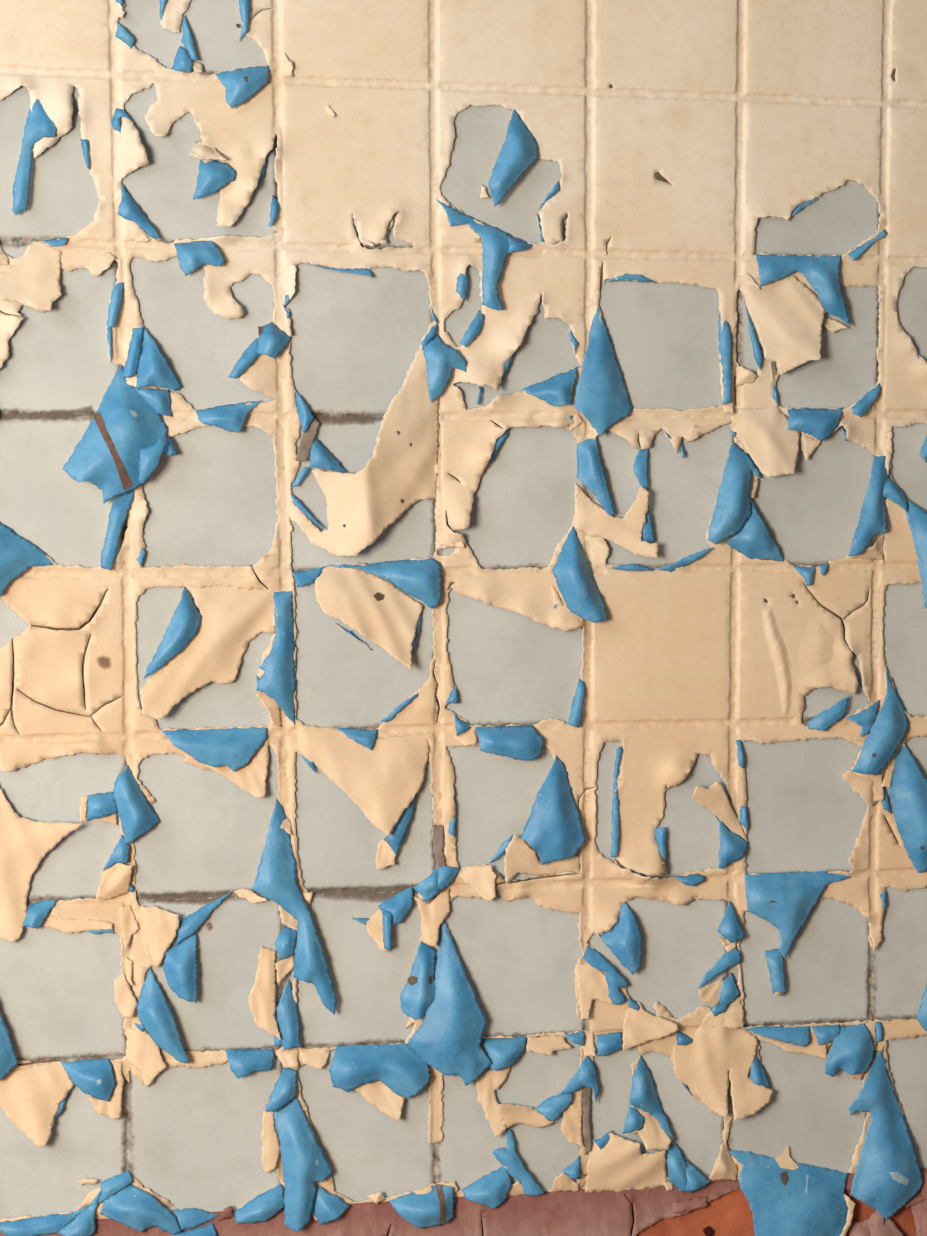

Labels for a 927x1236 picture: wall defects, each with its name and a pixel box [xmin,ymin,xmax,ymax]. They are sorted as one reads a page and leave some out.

peeling [115,0,293,109]
peeling [436,105,562,347]
crack [0,588,122,735]
peeling [0,83,467,1236]
peeling [295,180,927,1236]
crack [803,583,869,640]